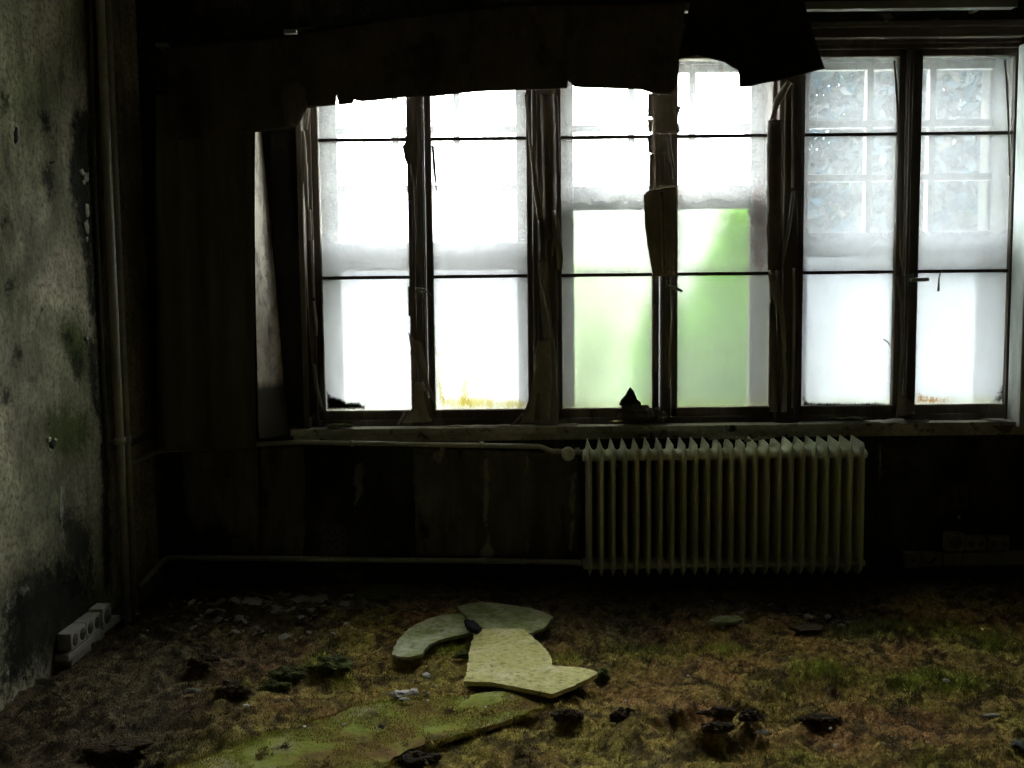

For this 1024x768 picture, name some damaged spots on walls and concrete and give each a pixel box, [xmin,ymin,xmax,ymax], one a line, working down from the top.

damp [1,1,112,699]